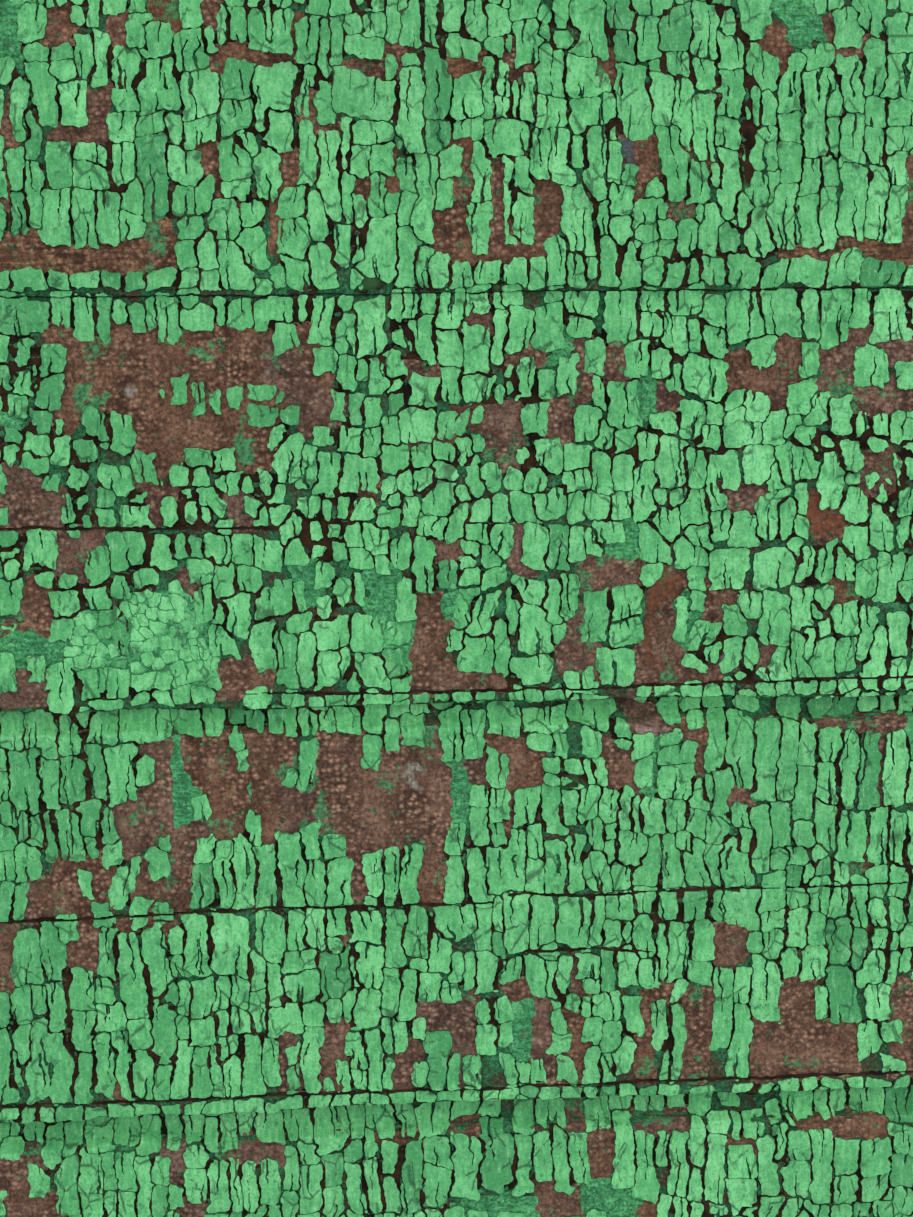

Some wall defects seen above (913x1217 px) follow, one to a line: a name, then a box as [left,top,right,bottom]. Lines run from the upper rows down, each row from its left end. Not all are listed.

crack [0,0,388,329]
peeling [0,0,913,732]
crack [0,75,913,856]
peeling [0,444,913,1217]
crack [397,0,913,392]